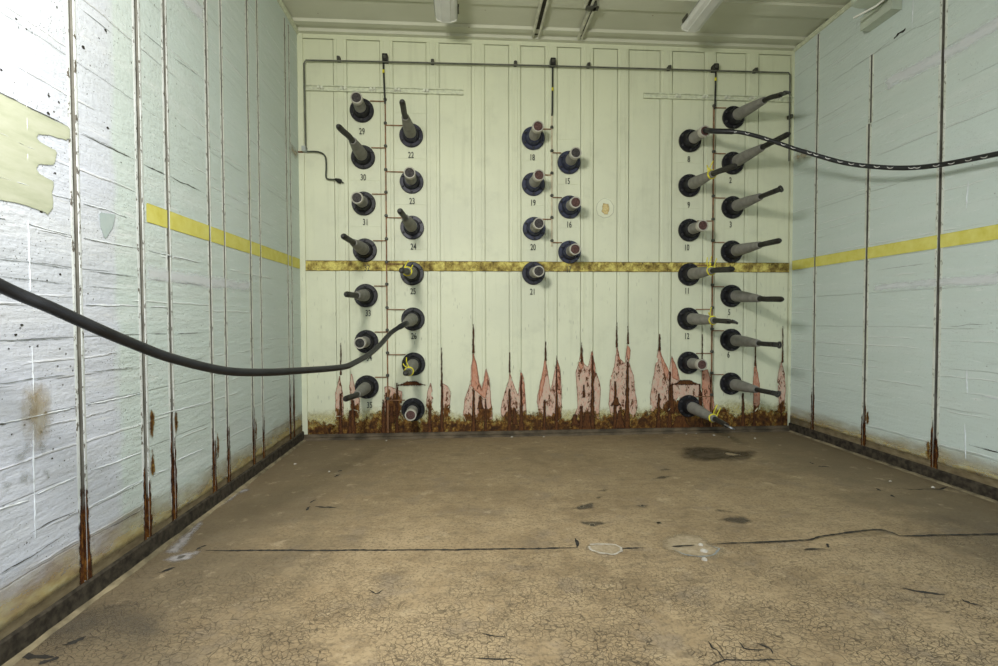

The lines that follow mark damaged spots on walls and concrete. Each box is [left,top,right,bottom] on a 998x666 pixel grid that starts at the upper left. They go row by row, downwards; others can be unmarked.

leakage [30,393,45,434]
peeling [335,346,360,434]
peeling [381,348,451,441]
rust [308,407,788,434]
peeling [463,322,714,438]
peeling [777,328,786,426]
rust [79,489,92,585]
rust [143,450,155,541]
rust [170,412,178,521]
crack [196,538,579,551]
crack [481,633,515,660]
crack [708,641,793,666]